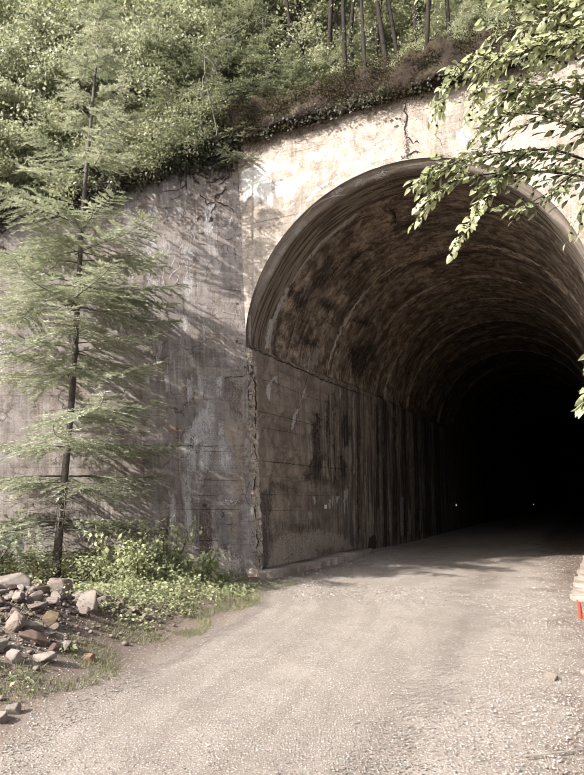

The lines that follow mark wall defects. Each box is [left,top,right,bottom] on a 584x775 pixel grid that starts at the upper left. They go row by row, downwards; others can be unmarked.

crack [403,102,442,155]
crack [141,176,233,300]
spalling [247,348,263,570]
damp [259,469,324,569]
damp [303,341,464,557]